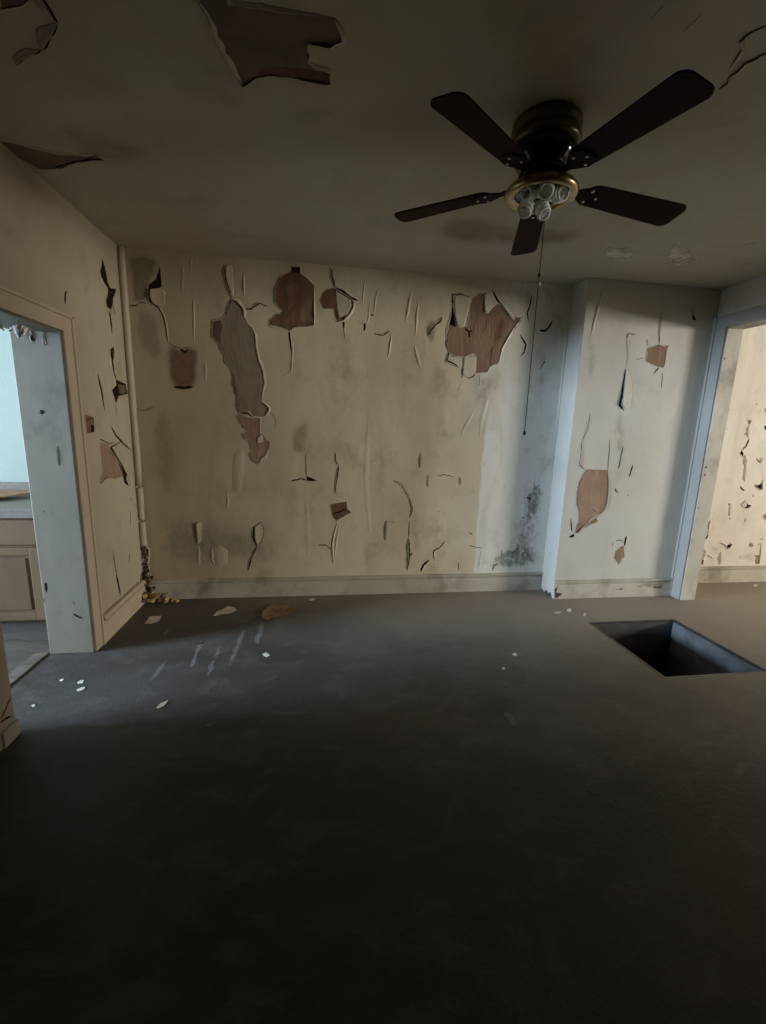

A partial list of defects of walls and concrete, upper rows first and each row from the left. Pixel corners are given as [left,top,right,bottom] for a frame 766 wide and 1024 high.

peeling [192,0,346,88]
crack [718,26,766,90]
peeling [99,257,128,404]
peeling [148,266,207,389]
peeling [210,265,359,465]
peeling [445,290,522,391]
peeling [619,310,669,410]
peeling [84,414,137,496]
peeling [329,501,352,521]
crack [383,453,461,572]
peeling [569,414,610,538]
peeling [728,419,766,521]